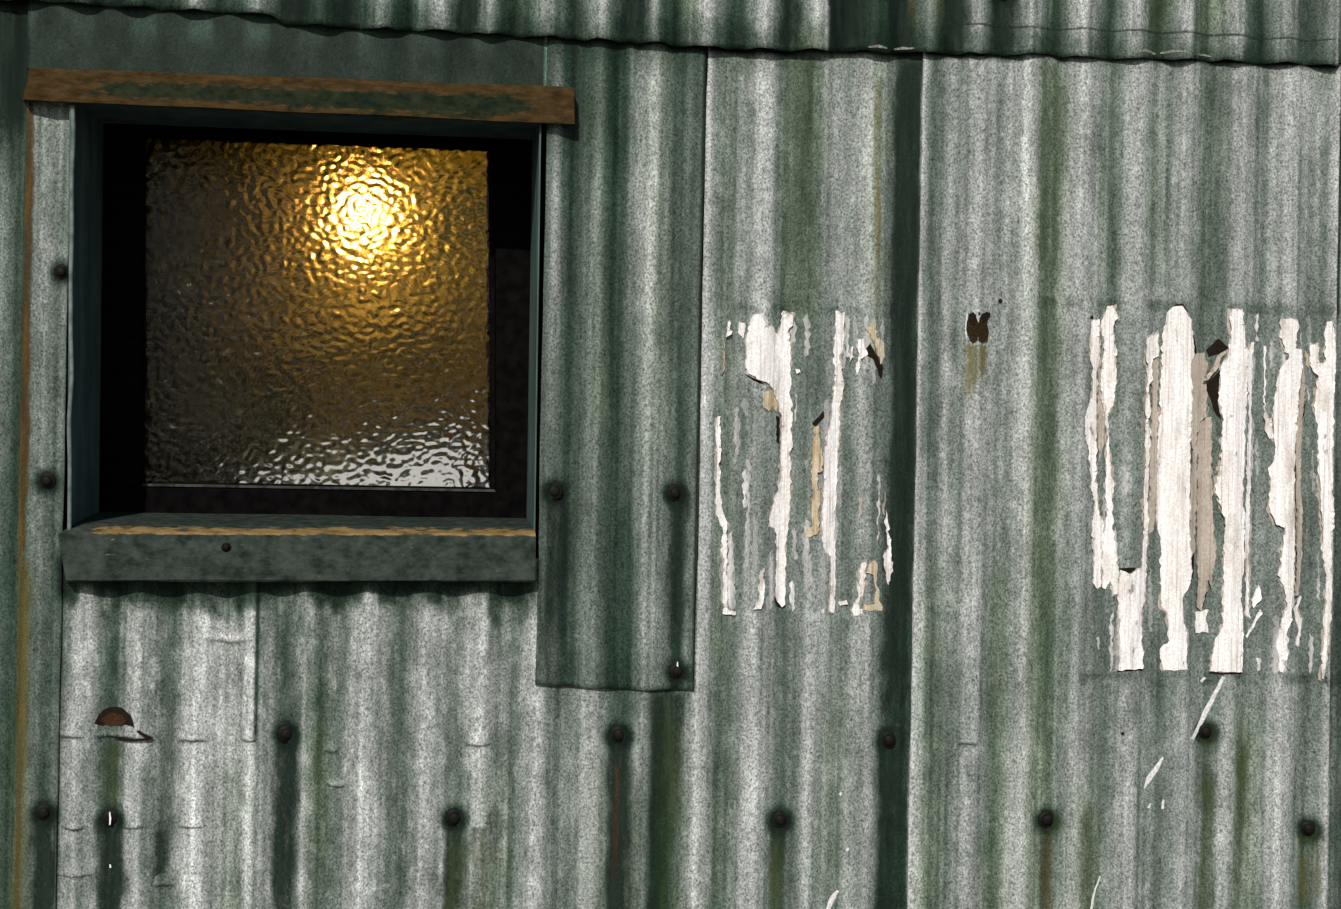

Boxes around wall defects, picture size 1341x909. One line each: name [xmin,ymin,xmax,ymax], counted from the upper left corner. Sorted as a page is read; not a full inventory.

corrosion [966,311,989,388]
corrosion [15,101,34,907]
corrosion [102,713,127,726]